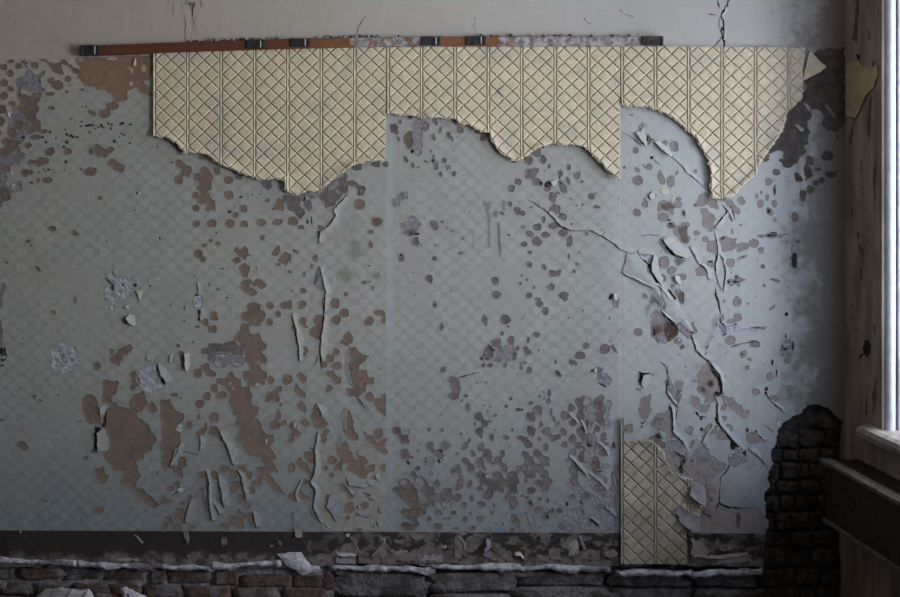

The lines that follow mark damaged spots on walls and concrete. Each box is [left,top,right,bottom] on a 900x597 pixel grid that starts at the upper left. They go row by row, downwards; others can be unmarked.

crack [709,0,729,47]
peeling [0,54,153,208]
peeling [169,140,388,241]
peeling [367,218,382,249]
peeling [390,115,464,177]
spalling [401,215,474,248]
peeling [500,147,597,315]
crack [532,201,661,253]
peeling [620,47,845,370]
crack [656,283,679,305]
crack [680,205,765,481]
peeling [0,245,841,597]